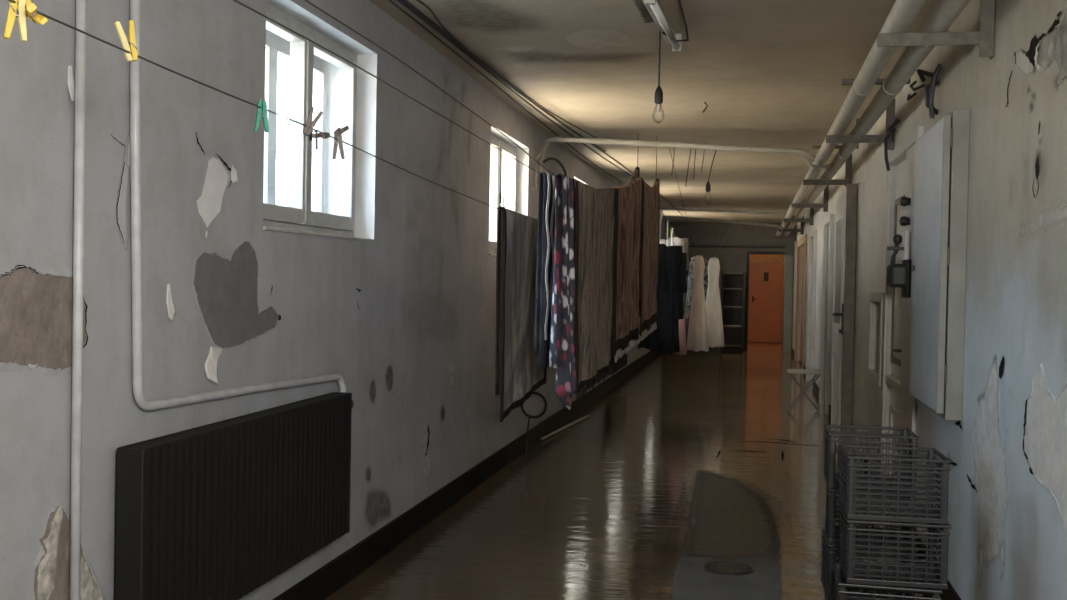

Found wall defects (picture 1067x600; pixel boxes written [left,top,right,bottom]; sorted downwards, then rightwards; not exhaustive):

flaking render [1006,5,1067,107]
peeling [192,133,281,384]
flaking render [0,260,90,377]
peeling [1023,363,1067,534]
flaking render [30,499,106,600]